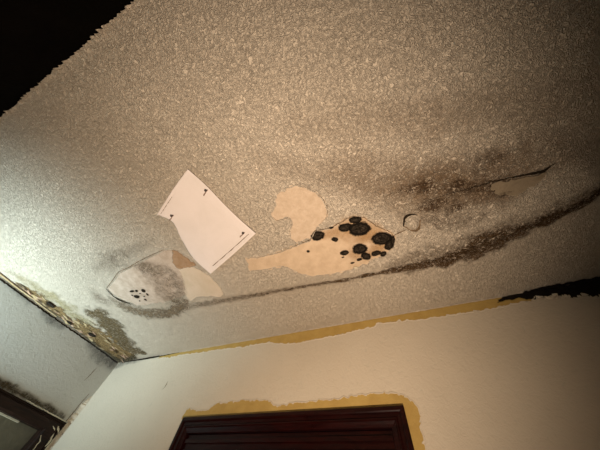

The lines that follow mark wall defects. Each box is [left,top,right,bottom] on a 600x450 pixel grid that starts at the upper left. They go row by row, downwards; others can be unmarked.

water stain [379,154,527,212]
crack [421,162,557,203]
water stain [42,290,146,366]
water stain [116,291,187,318]
flaking render [106,250,225,305]
water stain [139,250,196,276]
flaking render [245,185,405,277]
peeling [158,292,532,359]
water stain [221,188,600,303]
peeling [181,391,426,450]